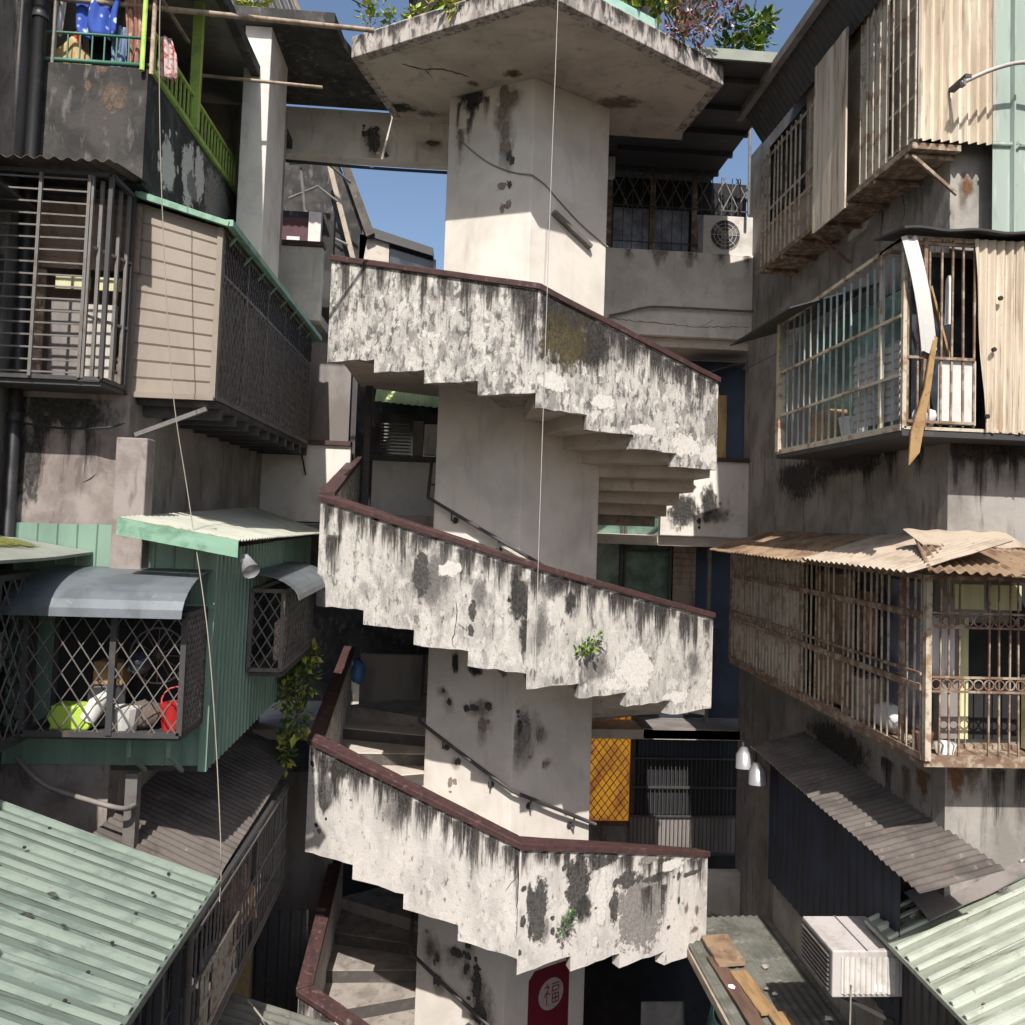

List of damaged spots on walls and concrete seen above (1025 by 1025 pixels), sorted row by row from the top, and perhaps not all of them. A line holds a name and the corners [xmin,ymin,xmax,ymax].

water stain [457,90,490,150]
peeling [157,129,231,220]
water stain [338,263,386,303]
water stain [400,271,716,403]
water stain [17,396,109,504]
water stain [667,485,729,530]
water stain [324,504,712,674]
water stain [580,643,614,685]
rust [807,717,929,804]
water stain [310,748,705,900]